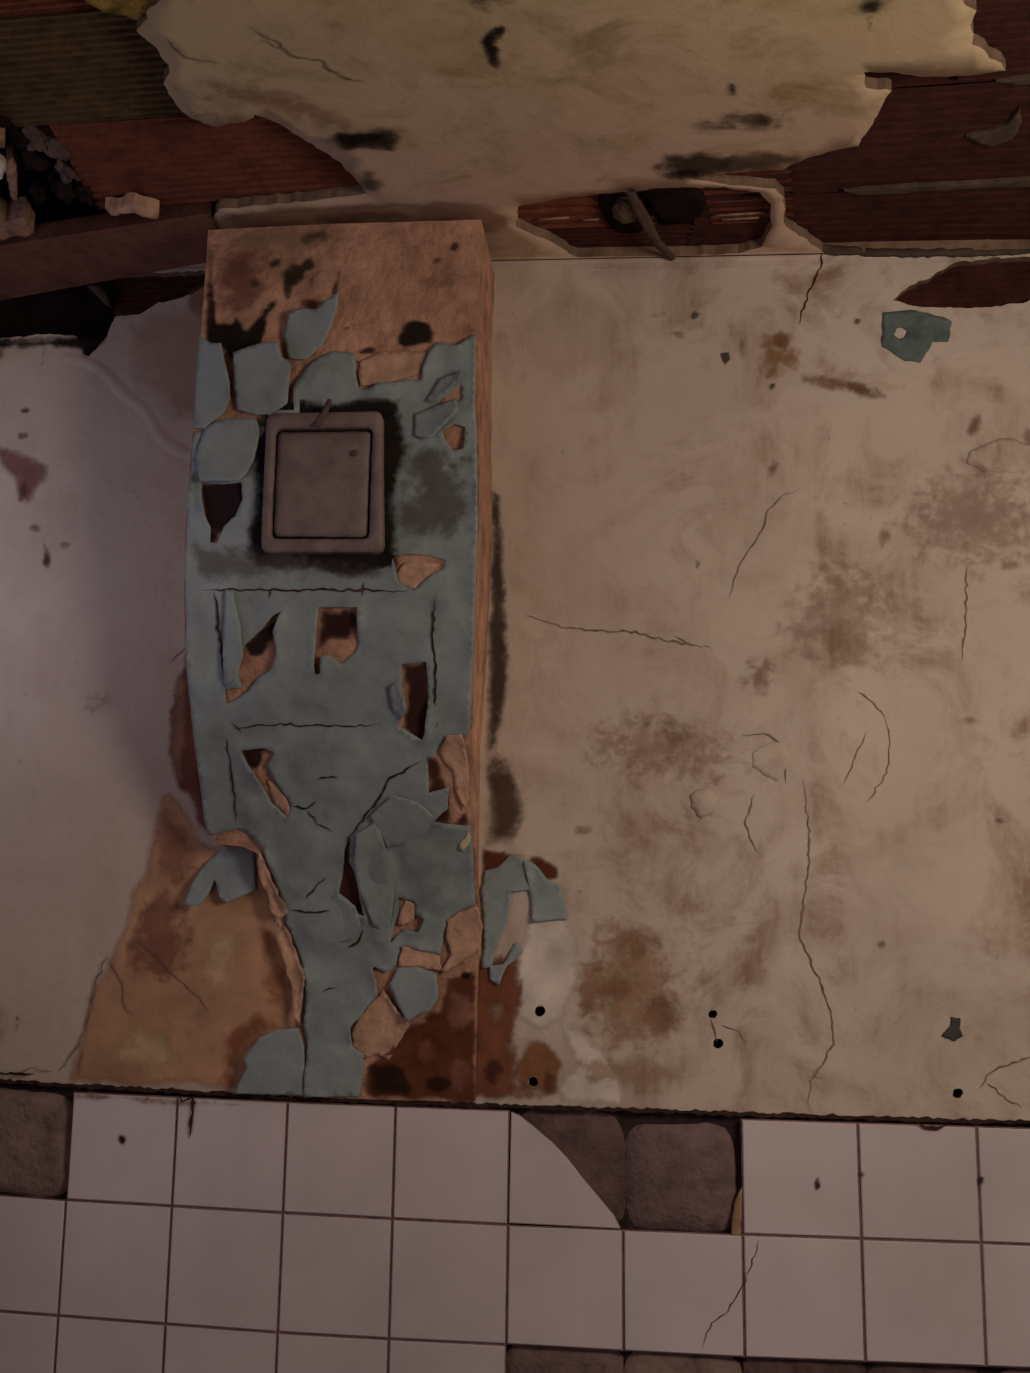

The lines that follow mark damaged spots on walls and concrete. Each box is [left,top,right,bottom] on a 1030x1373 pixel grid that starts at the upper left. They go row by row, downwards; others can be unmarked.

damp [482,27,505,67]
mould [656,152,792,180]
damp [731,115,780,128]
peeling [184,292,567,1097]
corrosion [483,495,521,871]
crack [527,615,710,648]
crack [844,692,891,803]
corrosion [531,858,557,879]
crack [0,733,1030,1138]
corrosion [366,957,561,1101]
peeling [509,1109,738,1233]
peeling [506,1345,977,1373]